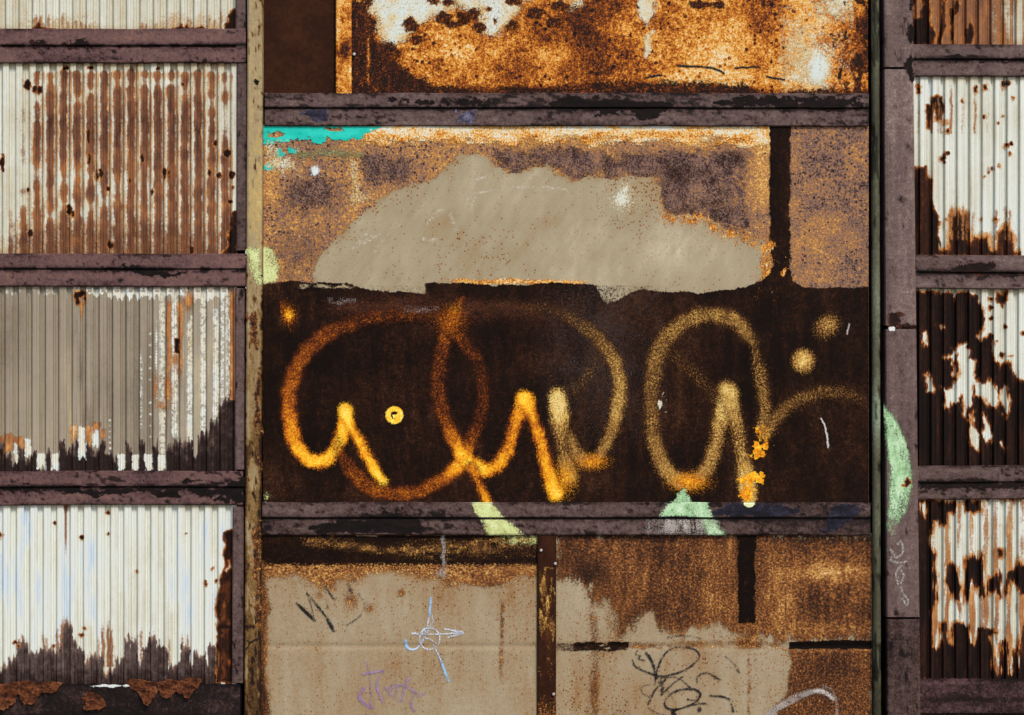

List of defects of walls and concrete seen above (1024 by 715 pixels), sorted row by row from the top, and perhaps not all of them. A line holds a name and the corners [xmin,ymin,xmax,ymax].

corrosion [352,0,760,93]
corrosion [778,0,868,94]
corrosion [2,67,233,254]
corrosion [265,126,798,292]
peeling [0,263,245,505]
peeling [885,165,1024,679]
corrosion [0,680,62,710]
corrosion [82,692,106,710]
peeling [0,621,221,688]
corrosion [126,677,202,706]
corrosion [220,576,231,679]
corrosion [556,535,872,715]